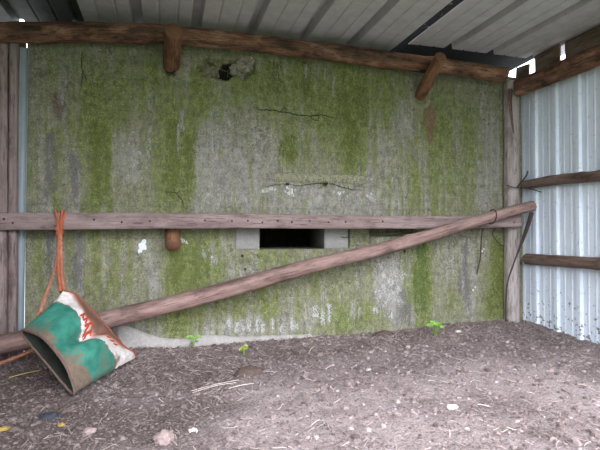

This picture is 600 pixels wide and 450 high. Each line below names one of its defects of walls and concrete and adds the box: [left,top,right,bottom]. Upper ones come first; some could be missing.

spalling [198,54,254,81]
crack [253,106,339,121]
water stain [163,110,195,202]
crack [264,183,370,192]
water stain [169,234,211,292]
water stain [399,243,430,325]
water stain [225,317,298,333]
water stain [312,304,332,326]